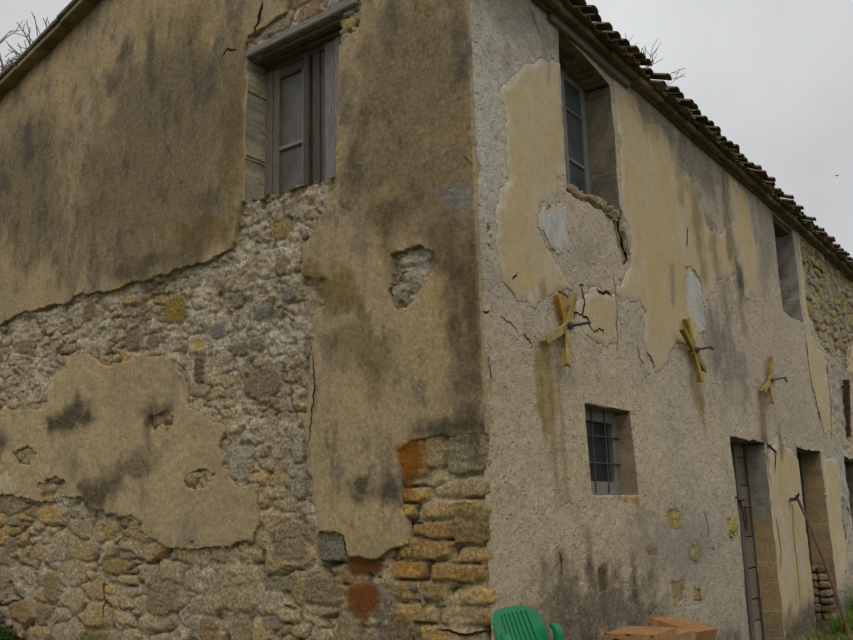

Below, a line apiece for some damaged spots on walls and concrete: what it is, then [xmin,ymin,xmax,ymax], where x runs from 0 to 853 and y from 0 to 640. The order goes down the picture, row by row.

crack [254,2,263,33]
peeling [487,55,757,373]
crack [574,274,655,367]
flaking render [796,232,853,436]
water stain [47,396,90,431]
flaking render [0,179,496,640]
crack [307,353,315,447]
crack [439,628,491,636]